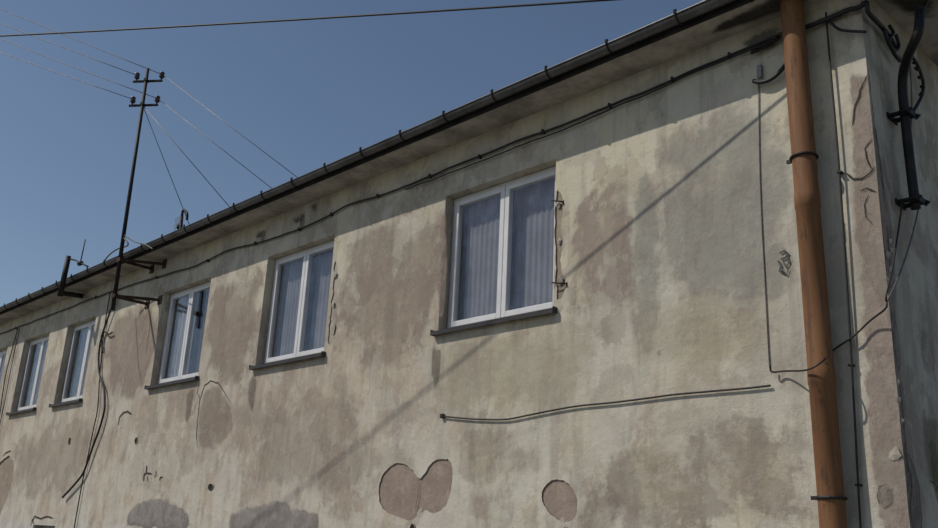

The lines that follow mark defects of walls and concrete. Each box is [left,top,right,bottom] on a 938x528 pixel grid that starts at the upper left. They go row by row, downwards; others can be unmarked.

spalling [845,71,923,528]
peeling [0,456,14,514]
peeling [379,459,453,528]
peeling [541,479,577,528]